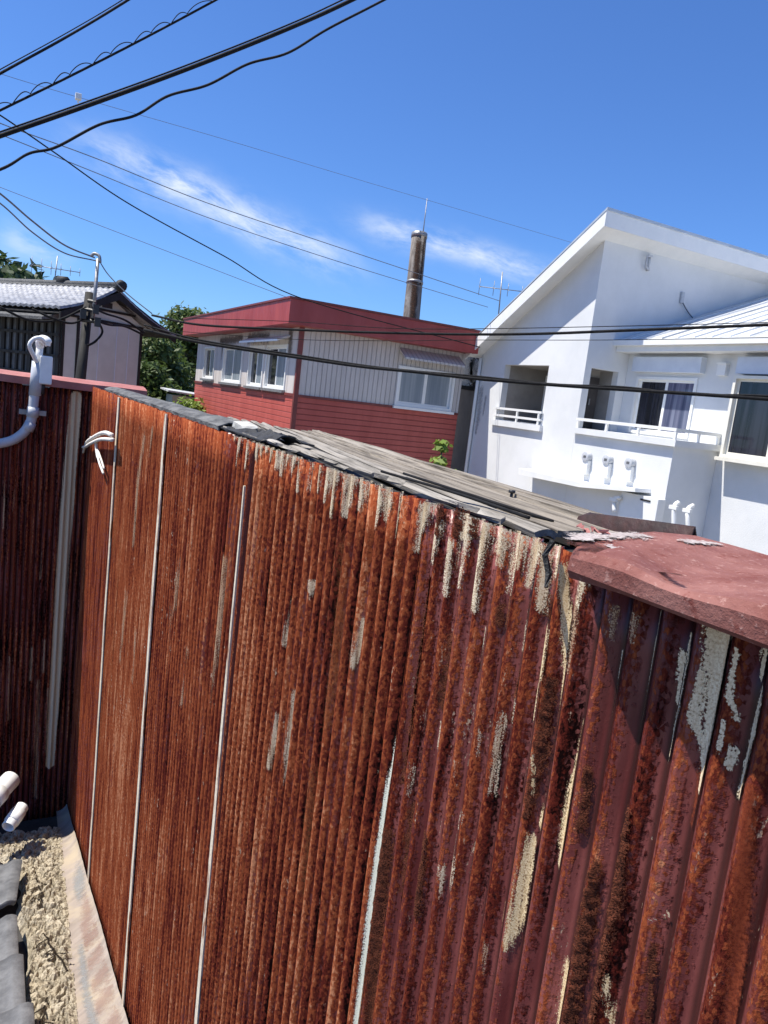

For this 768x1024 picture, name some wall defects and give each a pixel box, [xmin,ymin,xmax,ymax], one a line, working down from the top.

rust [216,448,255,847]
peeling [266,690,296,783]
rust [361,801,428,1024]
rust [399,576,431,786]
peeling [233,435,652,720]
rust [434,503,480,542]
peeling [502,811,544,952]
rust [521,674,559,820]
rust [574,764,595,838]
rust [561,806,632,1024]
peeling [669,625,768,798]
rust [723,783,756,1024]